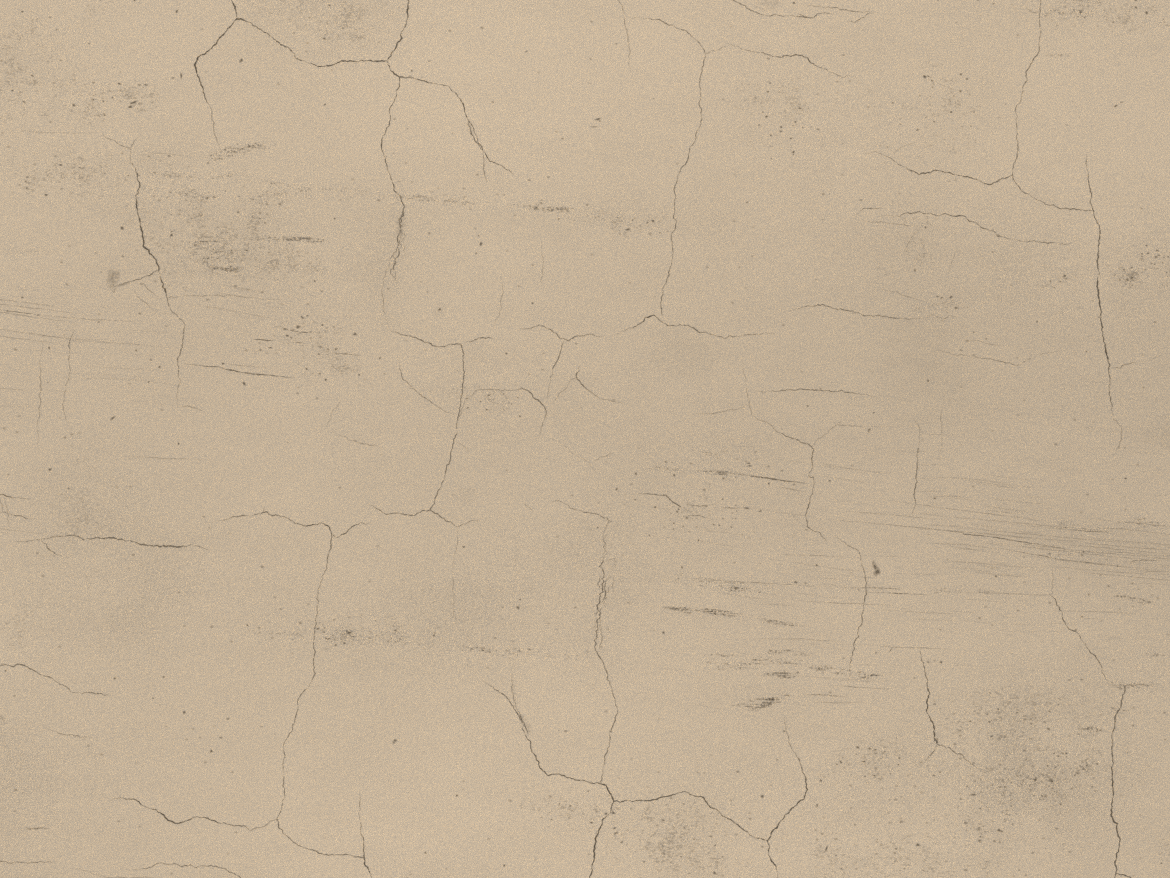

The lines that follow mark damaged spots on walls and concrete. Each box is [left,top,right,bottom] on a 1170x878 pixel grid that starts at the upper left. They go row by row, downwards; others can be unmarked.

crack [0,0,878,878]
crack [911,417,921,519]
crack [788,287,1060,367]
crack [854,0,1162,456]
crack [918,648,985,774]
crack [1049,566,1164,878]